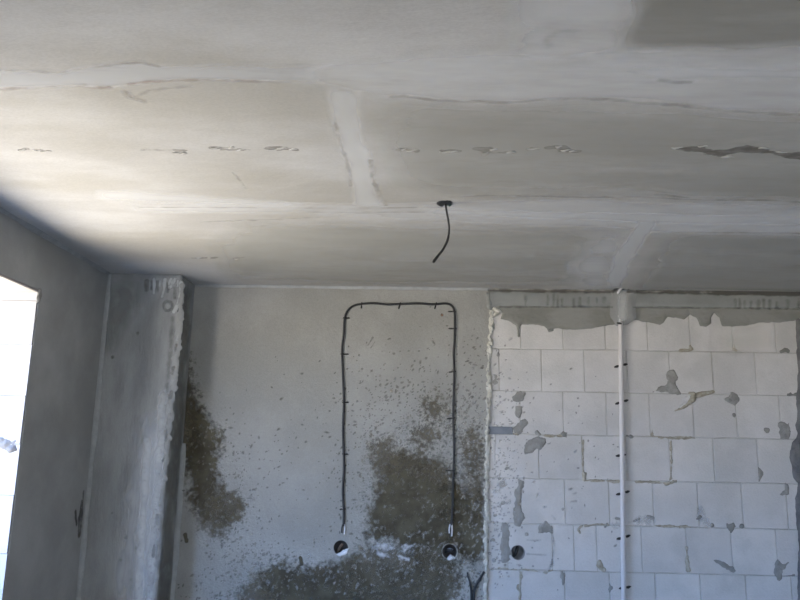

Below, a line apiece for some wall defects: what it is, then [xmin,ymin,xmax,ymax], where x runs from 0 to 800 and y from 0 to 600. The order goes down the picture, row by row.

water stain [108,277,486,600]